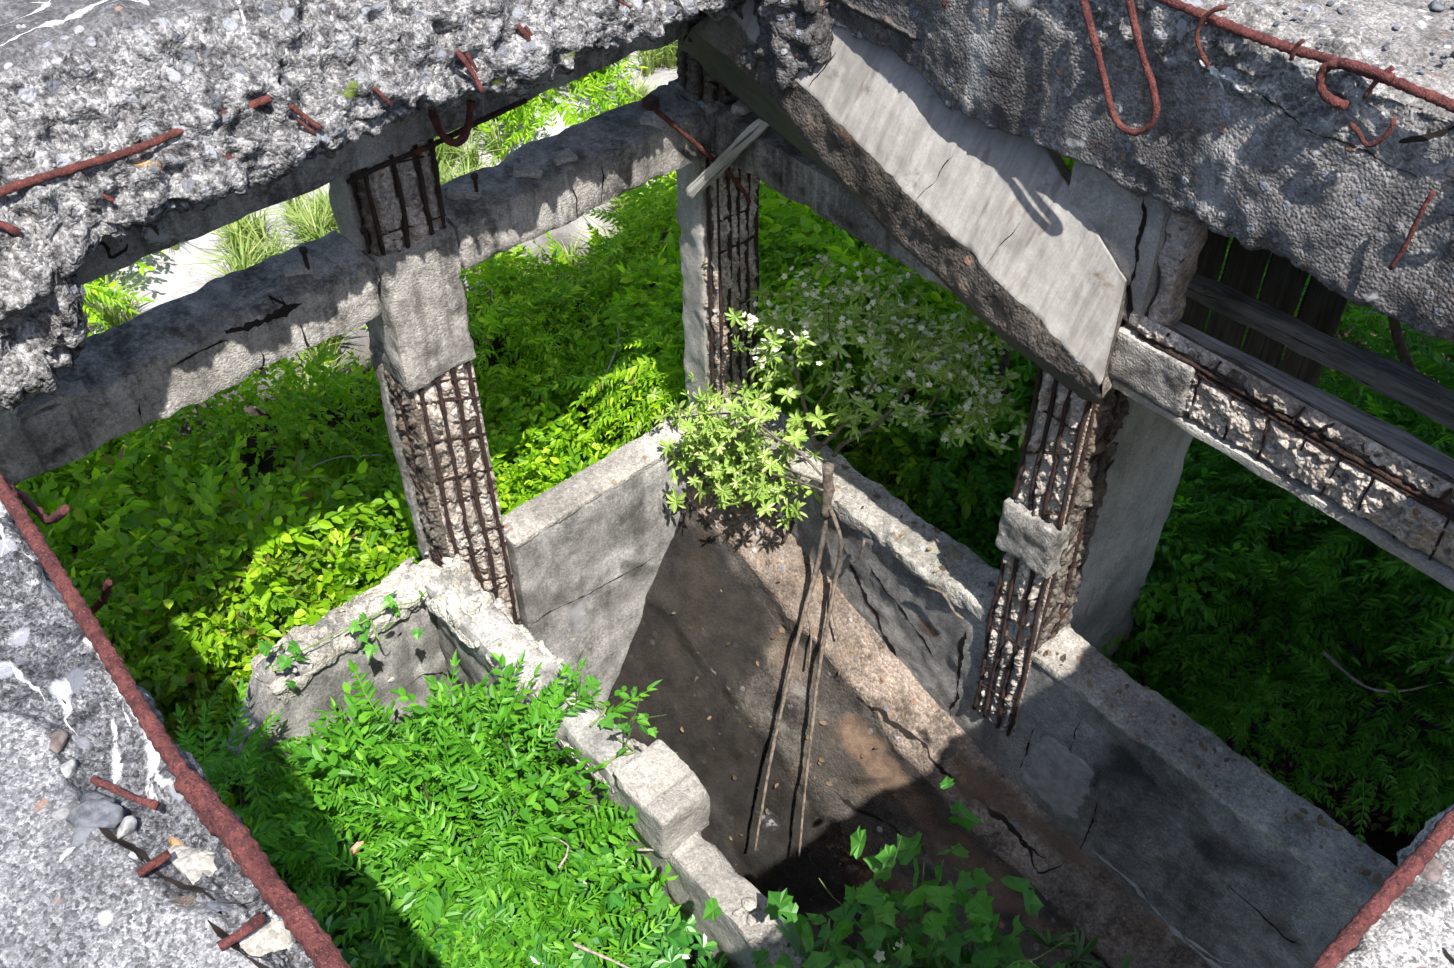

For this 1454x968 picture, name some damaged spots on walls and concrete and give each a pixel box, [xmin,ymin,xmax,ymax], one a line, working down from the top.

crack [0,0,179,46]
crack [236,0,246,36]
spalling [676,34,752,115]
crack [175,294,310,375]
spalling [350,138,483,257]
spalling [701,152,760,409]
spalling [383,360,521,625]
crack [788,518,796,533]
crack [844,550,967,716]
spalling [972,365,1130,738]
spalling [1137,315,1454,570]
crack [858,697,1098,874]